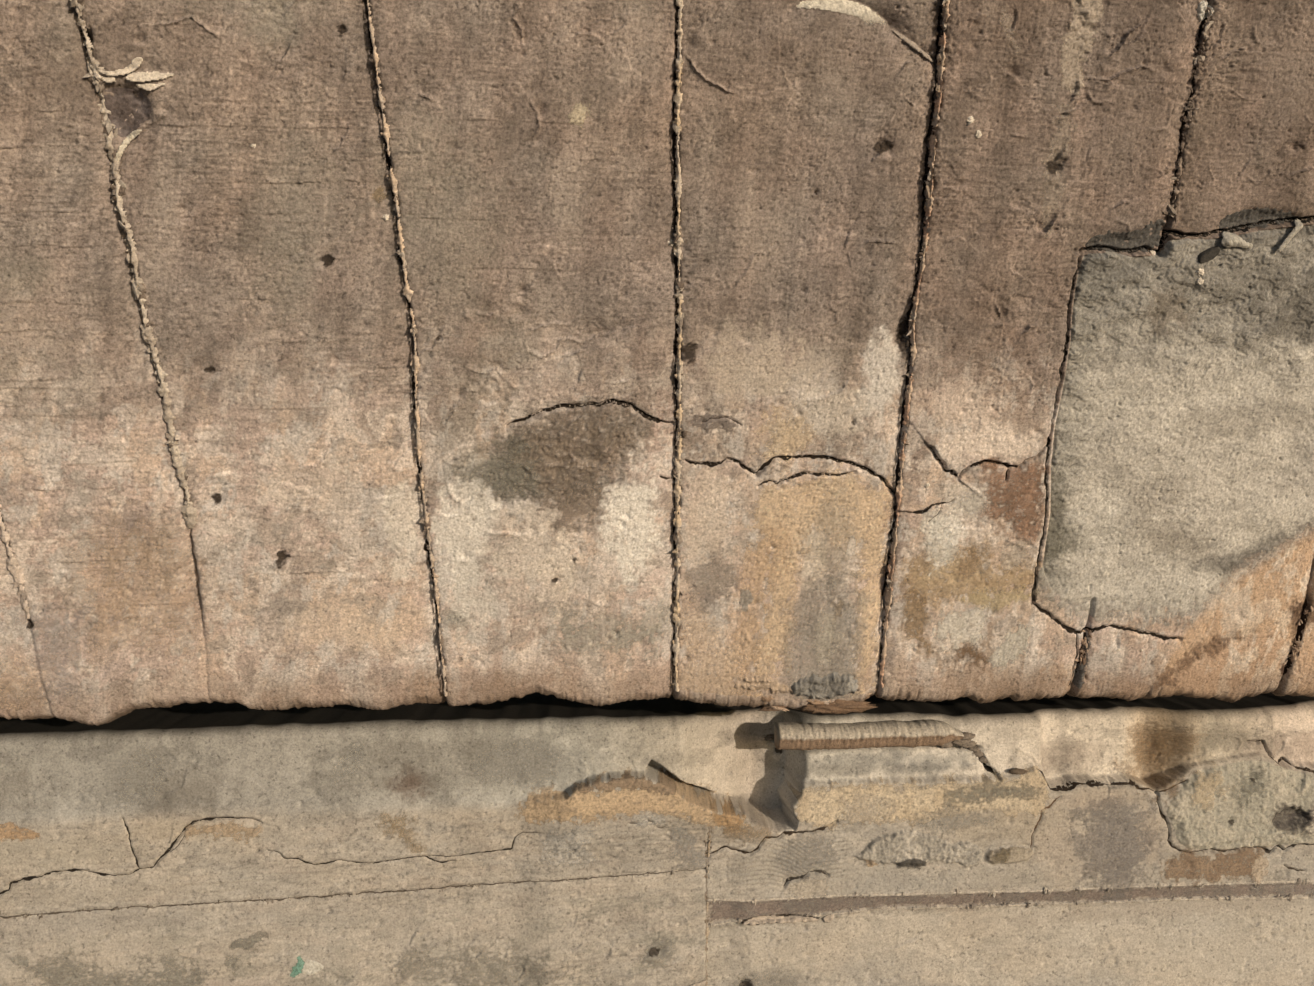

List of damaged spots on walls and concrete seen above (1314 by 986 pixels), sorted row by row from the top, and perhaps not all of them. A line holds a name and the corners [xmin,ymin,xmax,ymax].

peeling [796,0,934,62]
peeling [90,49,174,91]
spalling [1085,219,1165,253]
spalling [1219,207,1303,252]
crack [507,399,671,425]
crack [660,215,1314,686]
crack [1247,740,1314,773]
spalling [519,768,747,835]
crack [1030,768,1313,871]
crack [0,817,538,894]